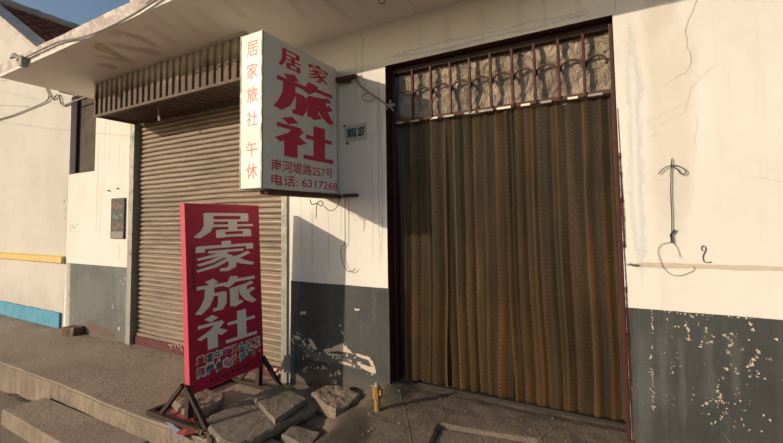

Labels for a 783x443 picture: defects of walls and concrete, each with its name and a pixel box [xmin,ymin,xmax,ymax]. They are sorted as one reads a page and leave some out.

crack [642,1,719,145]
peeling [291,324,376,384]
peeling [667,311,772,431]